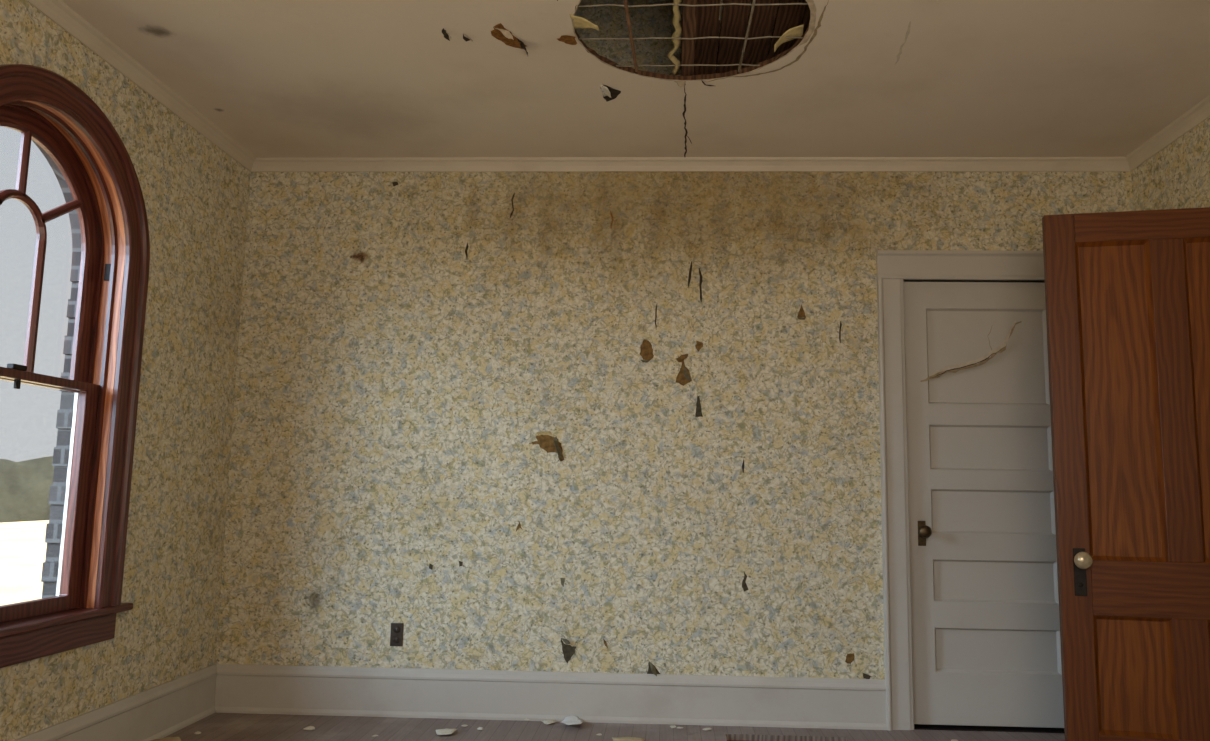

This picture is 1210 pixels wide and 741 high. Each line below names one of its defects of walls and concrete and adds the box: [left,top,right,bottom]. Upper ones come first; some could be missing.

flaking render [491,23,528,55]
spalling [572,0,829,86]
flaking render [600,83,621,101]
crack [682,84,692,157]
crack [921,321,1022,382]